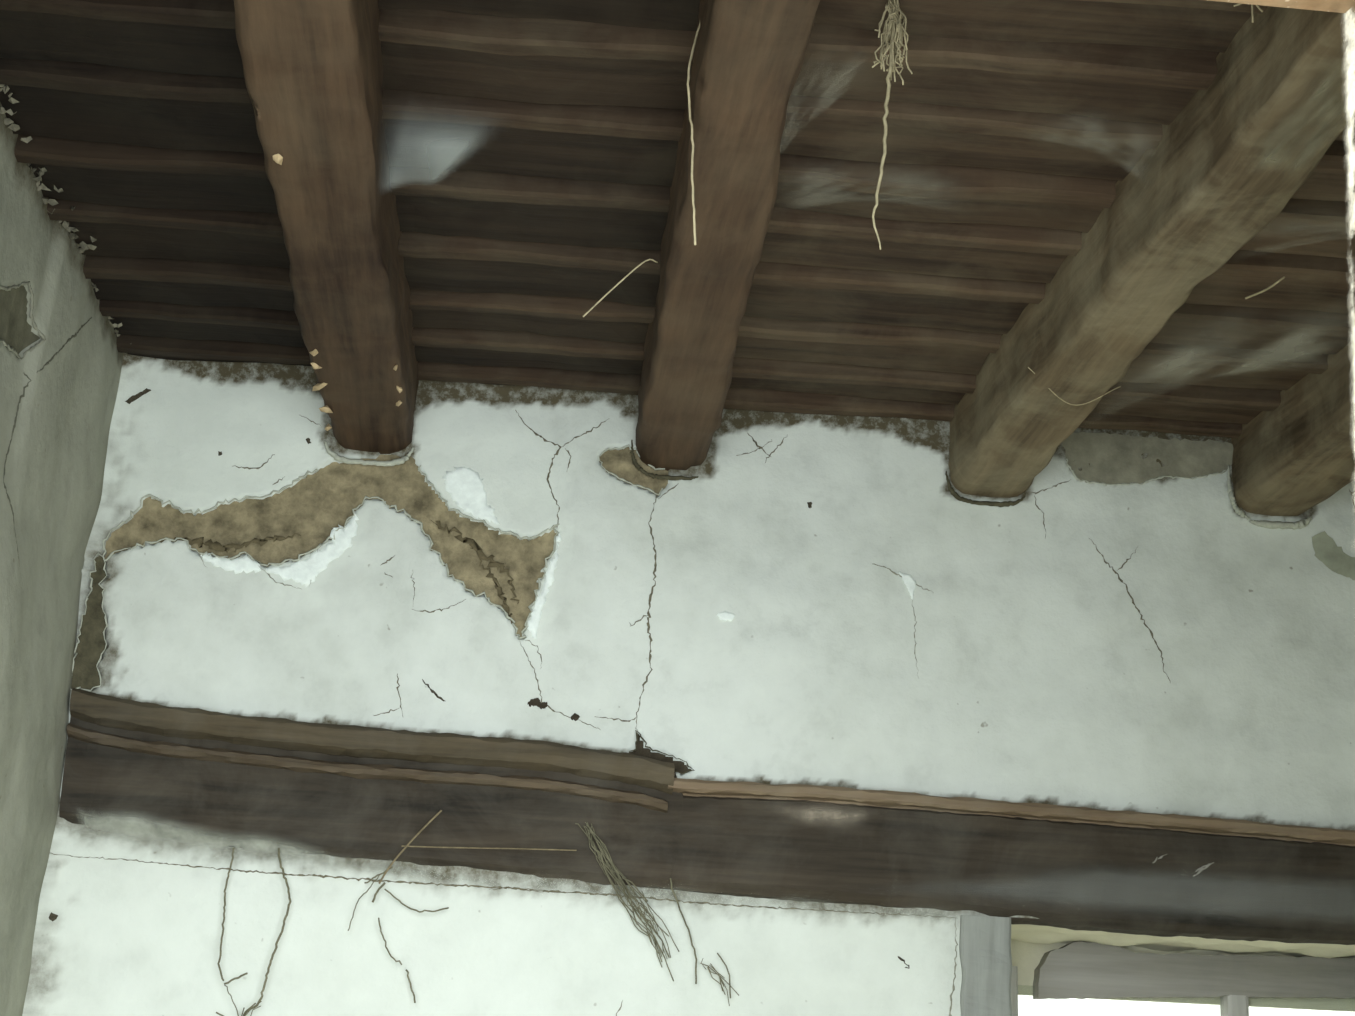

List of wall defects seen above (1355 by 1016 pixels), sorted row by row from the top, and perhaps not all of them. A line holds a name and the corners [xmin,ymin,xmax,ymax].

peeling [0,281,46,360]
crack [515,410,608,527]
spalling [70,454,561,692]
crack [520,483,679,736]
crack [1089,538,1170,681]